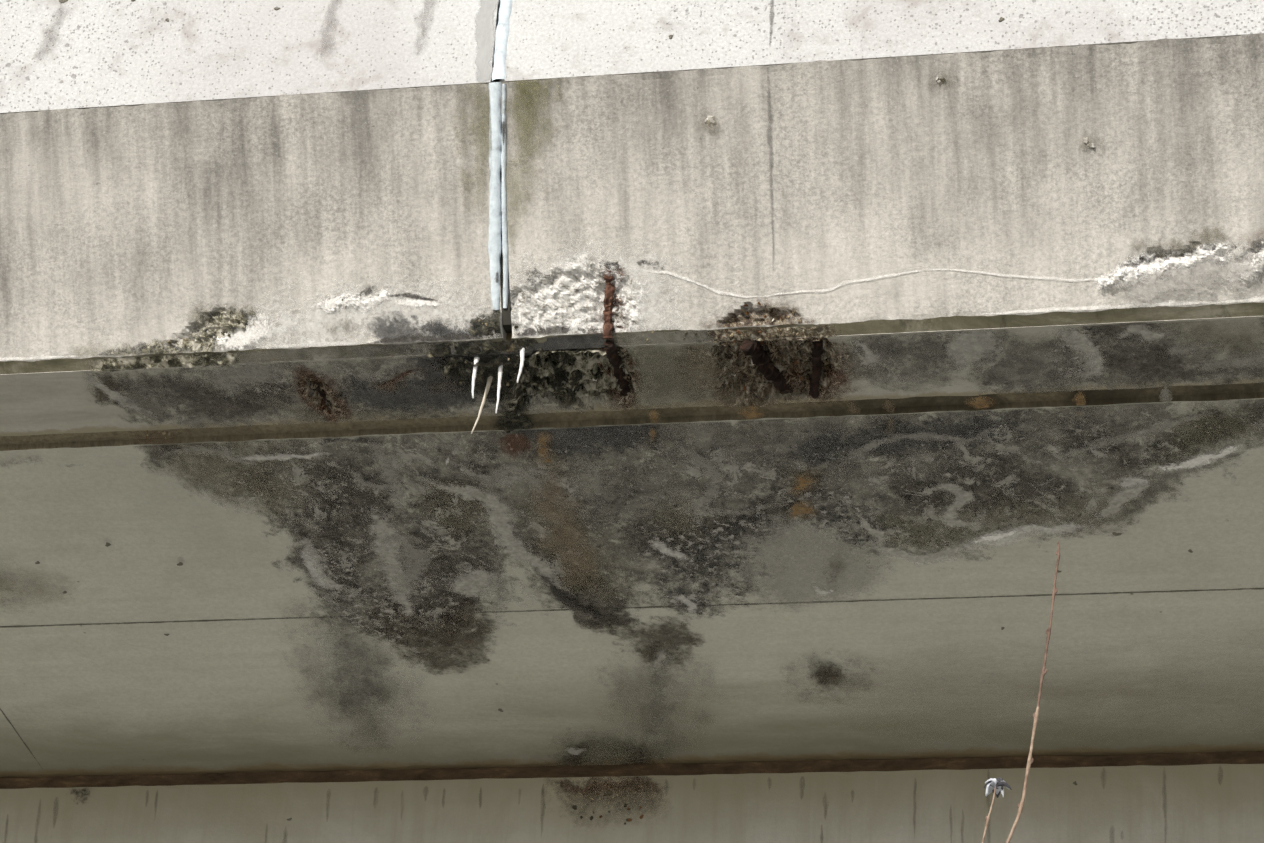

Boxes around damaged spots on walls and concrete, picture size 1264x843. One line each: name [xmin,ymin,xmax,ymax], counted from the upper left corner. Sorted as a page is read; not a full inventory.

spalling [88,308,298,372]
damp [87,282,615,428]
spalling [494,245,856,430]
crack [630,260,1098,298]
damp [838,323,1264,393]
damp [985,297,1264,314]
rust [293,368,351,421]
damp [143,399,1264,766]